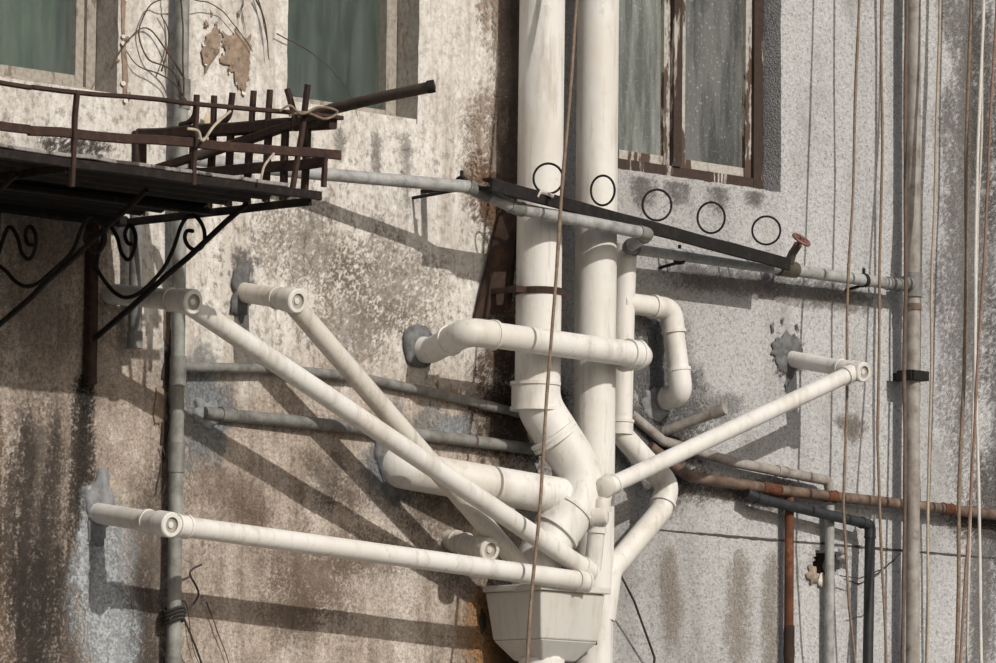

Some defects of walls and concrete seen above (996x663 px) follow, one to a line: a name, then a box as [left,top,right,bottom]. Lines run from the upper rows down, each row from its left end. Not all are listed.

peeling [201,9,252,95]
leakage [460,0,520,185]
leakage [68,374,96,553]